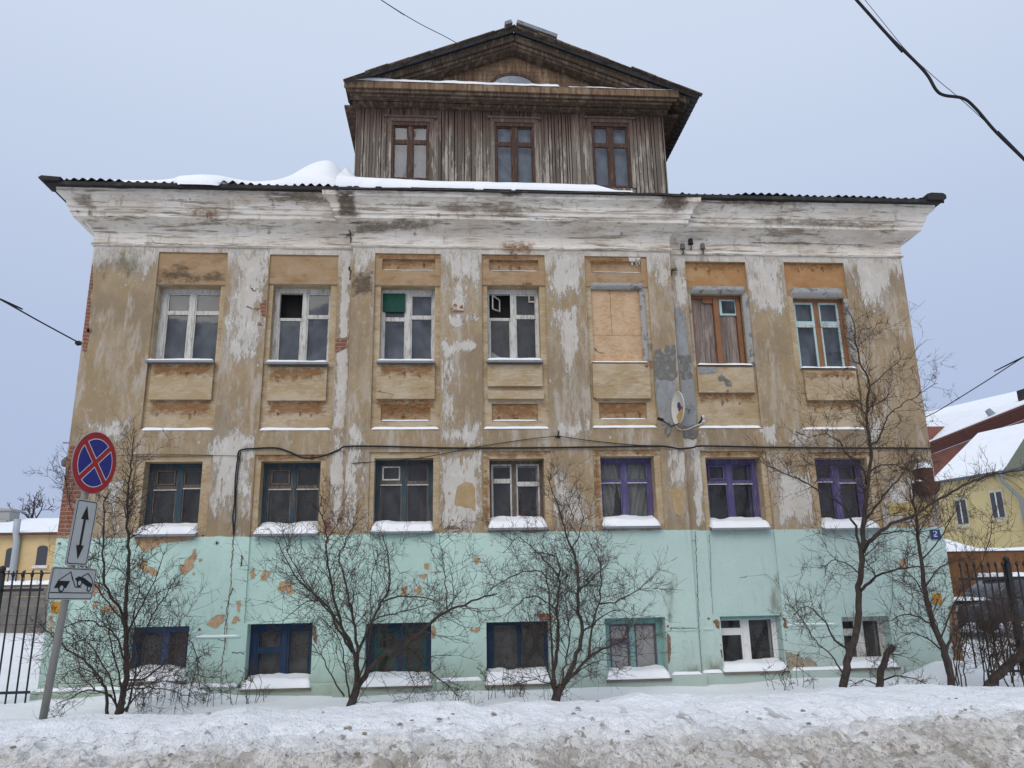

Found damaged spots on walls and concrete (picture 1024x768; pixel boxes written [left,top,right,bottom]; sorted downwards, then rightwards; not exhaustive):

flaking render [337,189,358,216]
peeling [82,247,269,370]
peeling [537,251,588,381]
peeling [848,257,902,315]
peeling [325,249,372,549]
peeling [440,250,483,538]
peeling [198,427,256,533]
peeling [667,431,707,541]
peeling [396,563,436,602]